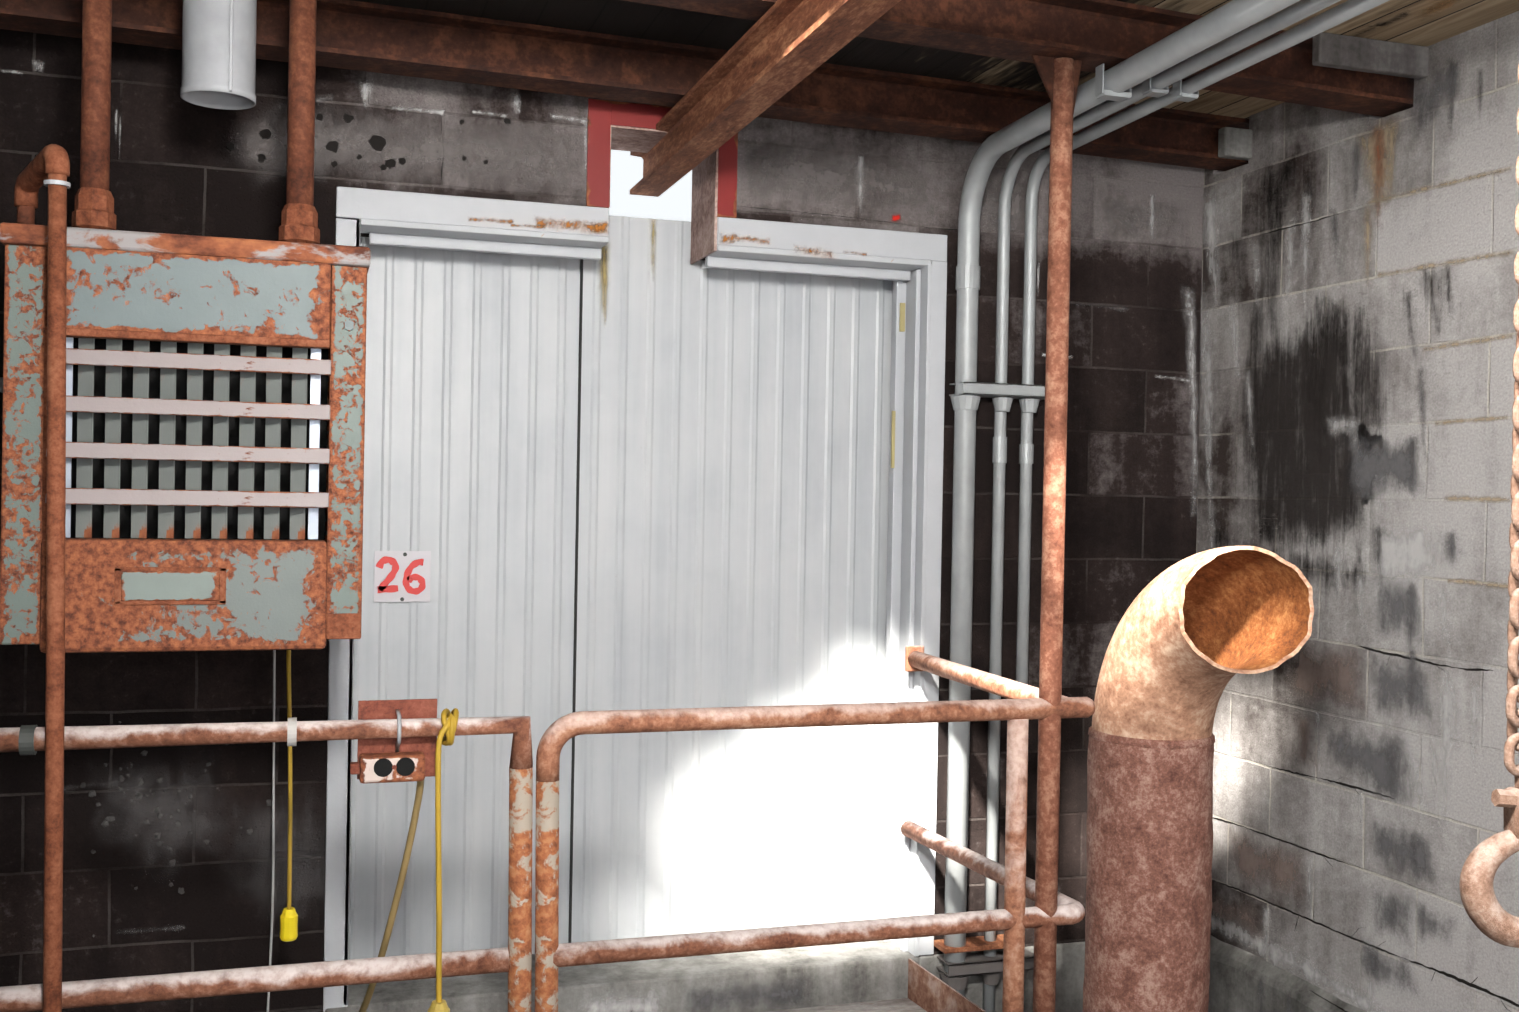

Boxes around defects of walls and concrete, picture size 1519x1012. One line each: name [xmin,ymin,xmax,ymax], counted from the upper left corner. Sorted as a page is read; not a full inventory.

corrosion [469,218,608,289]
water stain [1206,201,1216,284]
water stain [1233,163,1311,358]
water stain [1191,331,1211,457]
water stain [1309,303,1416,508]